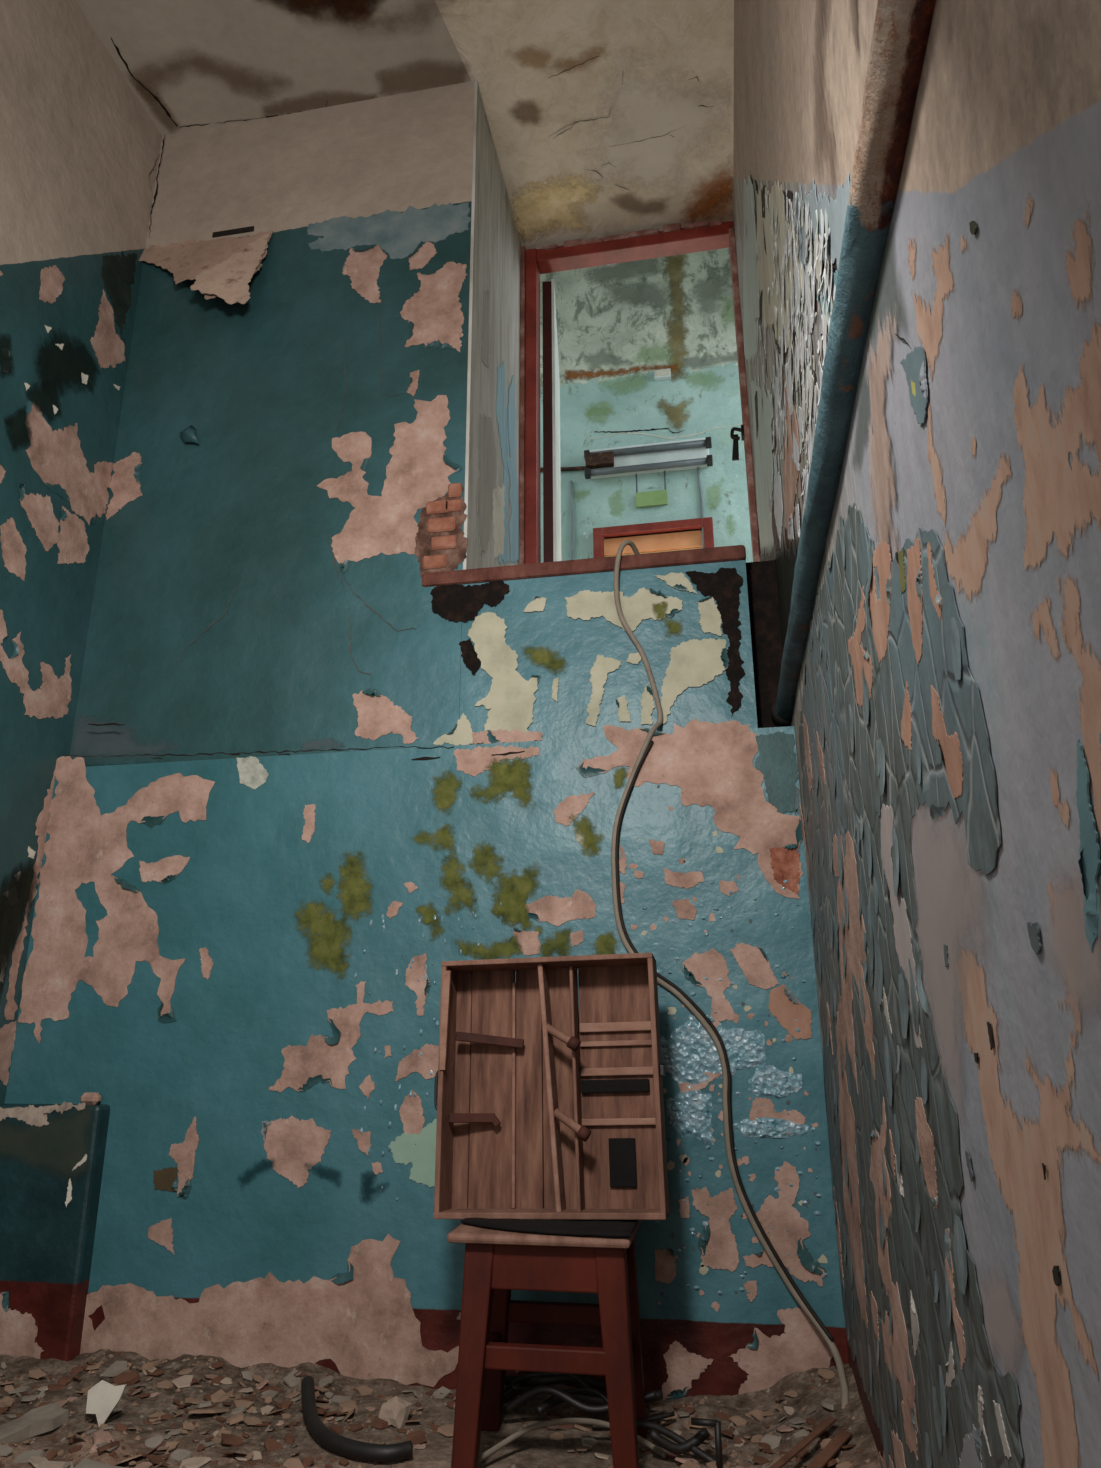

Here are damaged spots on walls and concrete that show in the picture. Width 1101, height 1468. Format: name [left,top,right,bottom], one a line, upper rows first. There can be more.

crack [111,38,328,238]
damp [275,0,378,23]
damp [266,65,464,114]
peeling [0,251,143,581]
peeling [317,290,520,577]
peeling [352,612,559,777]
peeling [0,756,215,1086]
mould [295,852,372,979]
mould [414,759,571,960]
mould [570,816,601,856]
peeling [554,172,1101,1468]
peeling [80,1234,459,1387]